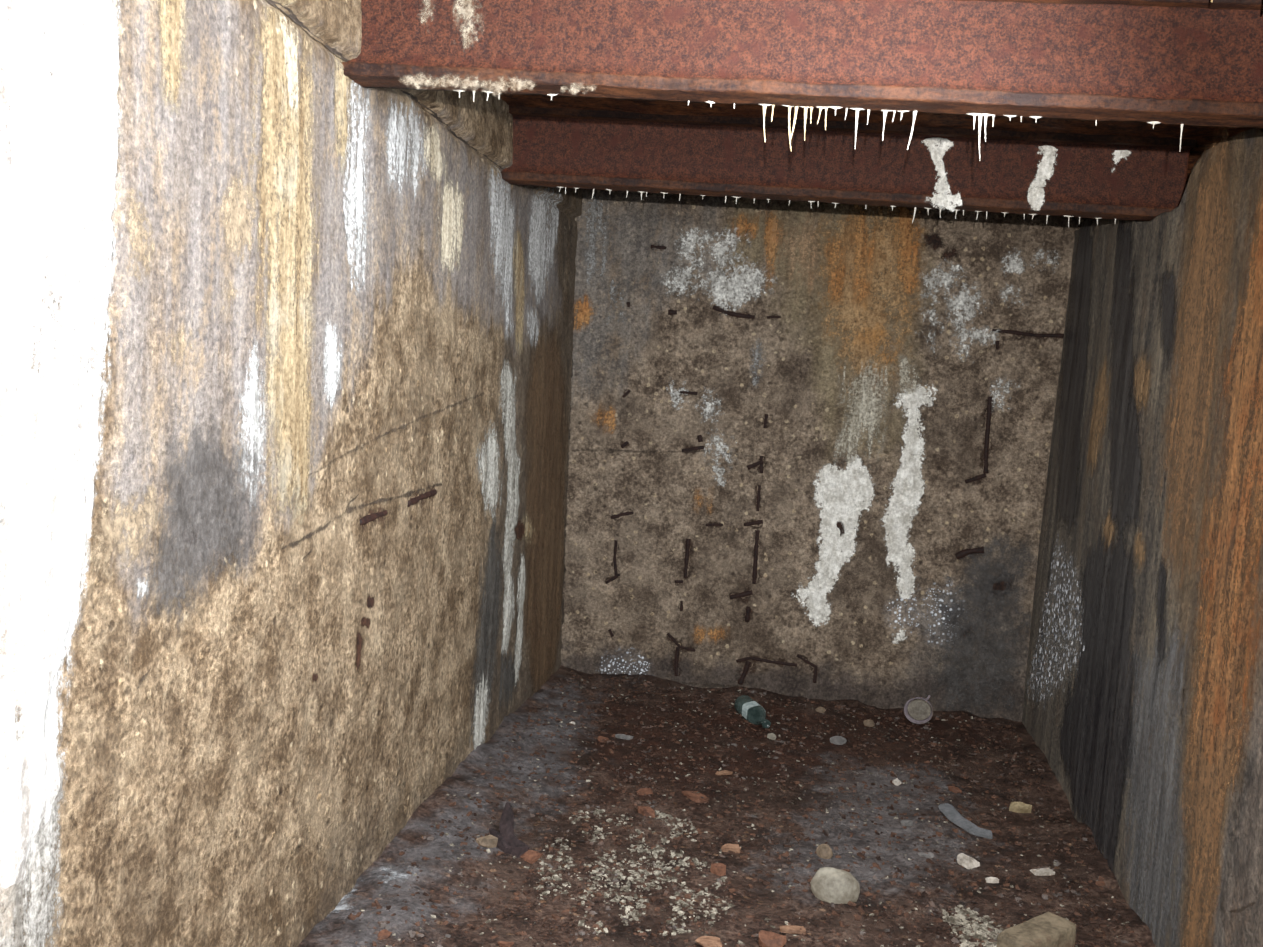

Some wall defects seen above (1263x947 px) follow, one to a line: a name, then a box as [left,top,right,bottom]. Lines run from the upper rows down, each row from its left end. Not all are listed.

efflorescence [923,137,962,212]
efflorescence [1027,145,1058,211]
efflorescence [664,228,775,311]
rust [732,204,924,393]
efflorescence [0,0,121,947]
water stain [147,341,268,622]
crack [283,483,442,560]
water stain [792,218,1185,947]
rust [1087,359,1111,474]
rust [1134,354,1150,410]
rust [1162,127,1263,947]